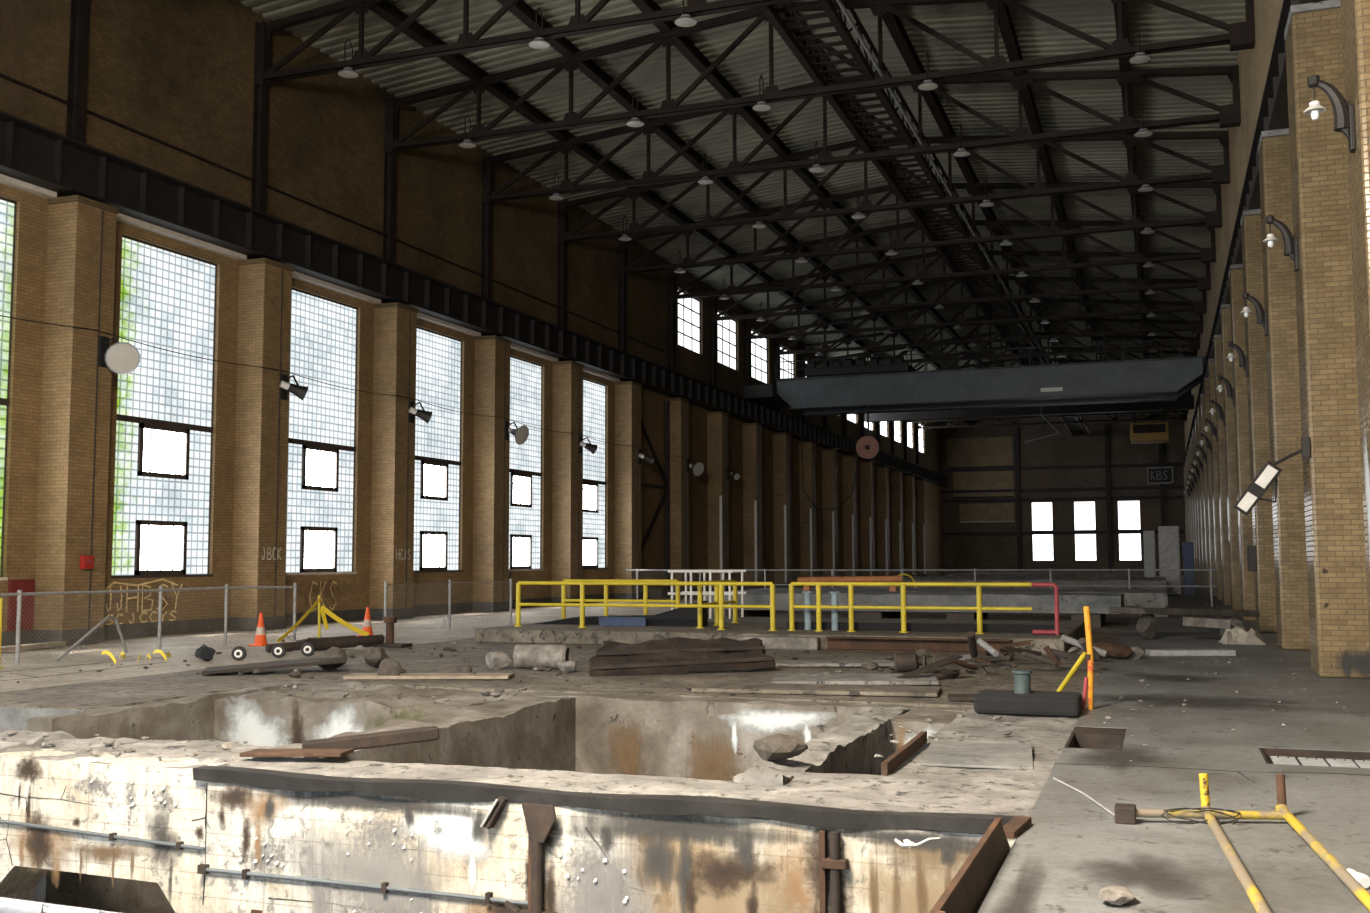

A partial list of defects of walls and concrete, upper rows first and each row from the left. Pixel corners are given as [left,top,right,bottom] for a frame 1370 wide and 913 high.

rust [19,817,69,877]
rust [473,860,528,913]
rust [545,866,555,911]
rust [545,825,560,847]
rust [638,838,778,913]
rust [807,828,850,913]
rust [880,861,956,913]